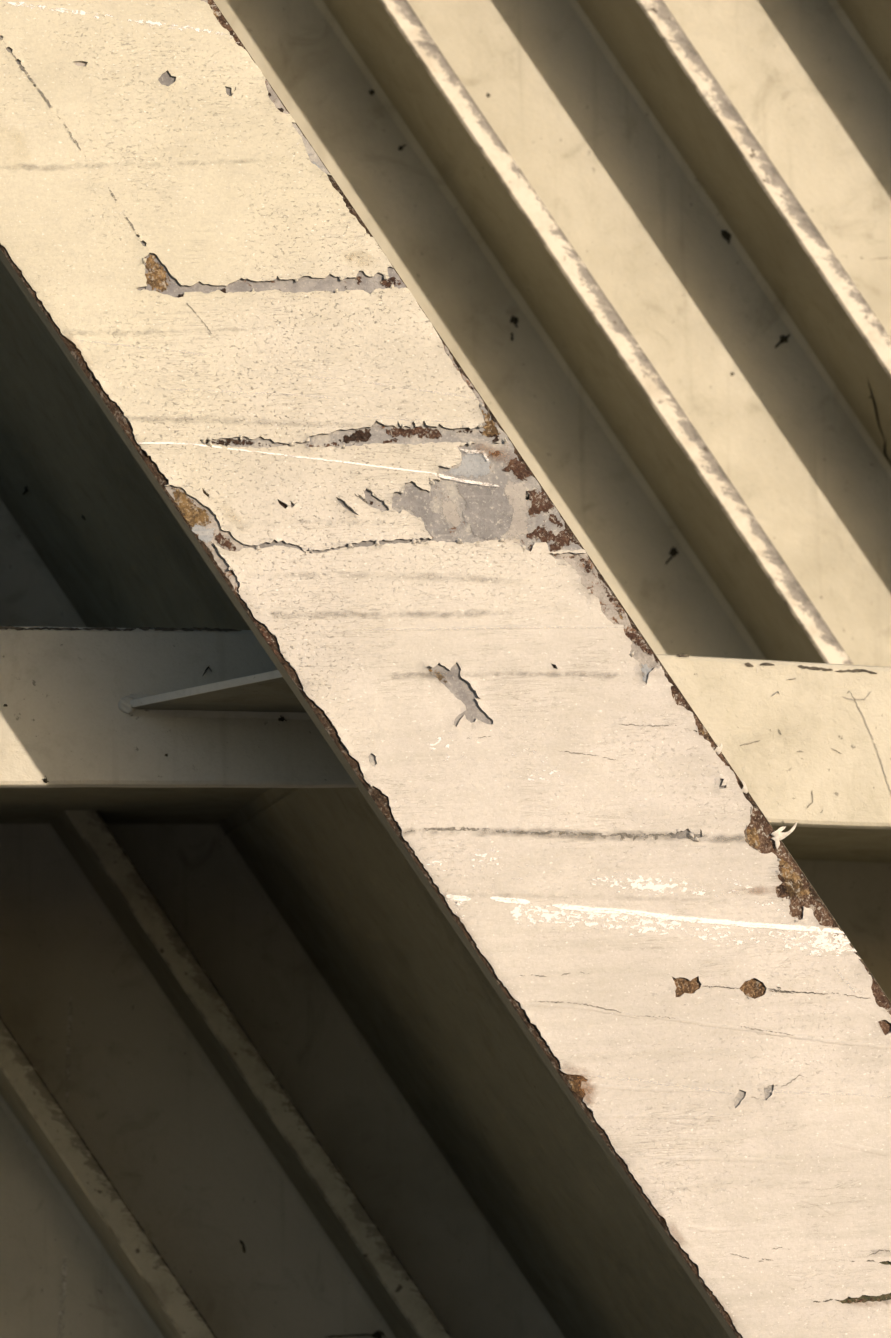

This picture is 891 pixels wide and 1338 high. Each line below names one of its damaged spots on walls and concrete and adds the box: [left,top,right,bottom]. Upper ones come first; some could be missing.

rust [201,0,244,48]
peeling [137,253,407,298]
peeling [200,402,582,552]
peeling [165,485,243,593]
peeling [427,662,493,726]
rust [671,686,841,949]
leakage [490,896,857,957]
rust [672,976,701,997]
rust [739,978,766,999]
rust [859,959,891,1035]
crack [814,1249,891,1304]